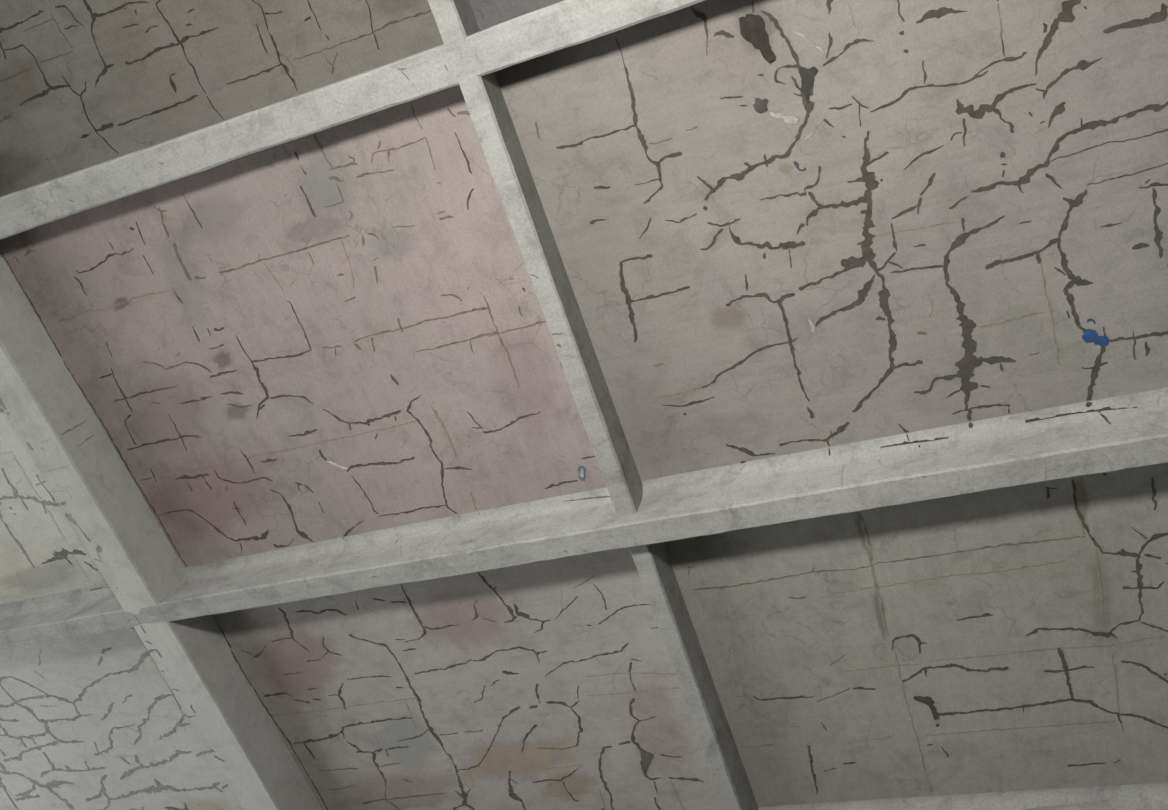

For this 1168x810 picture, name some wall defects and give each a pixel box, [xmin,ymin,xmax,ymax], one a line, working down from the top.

crack [0,0,704,810]
spalling [739,14,776,64]
crack [535,0,1168,486]
crack [687,478,1168,794]